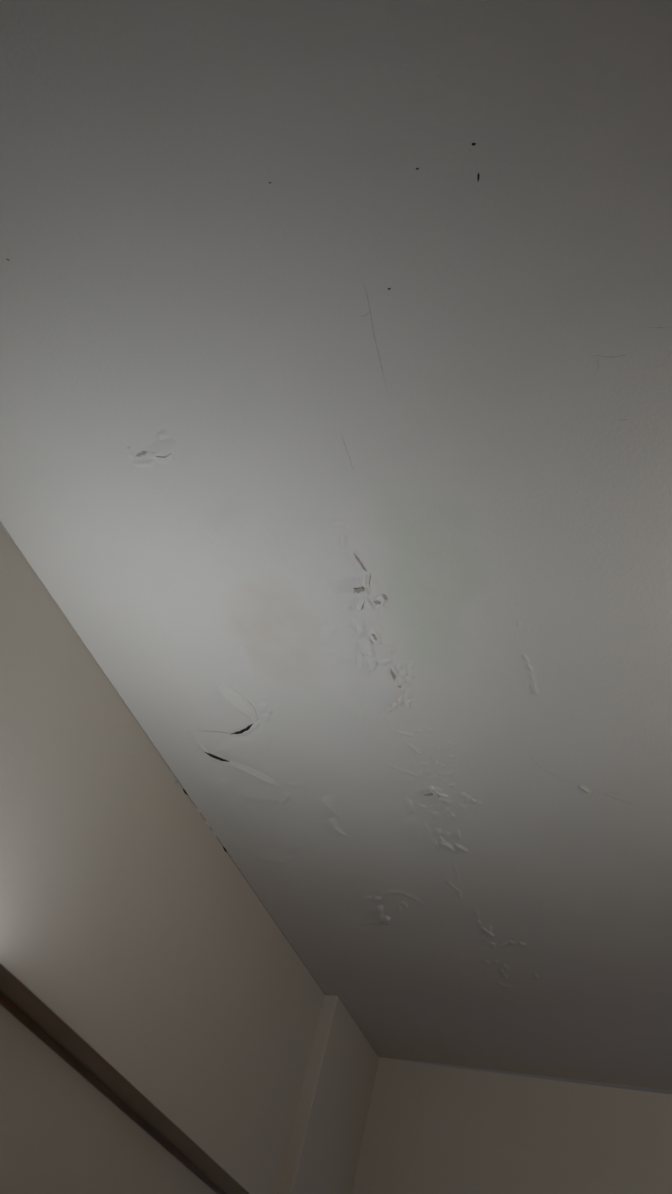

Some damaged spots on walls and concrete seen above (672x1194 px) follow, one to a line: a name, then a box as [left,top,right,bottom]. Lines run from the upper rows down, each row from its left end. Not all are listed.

peeling [347,545,391,625]